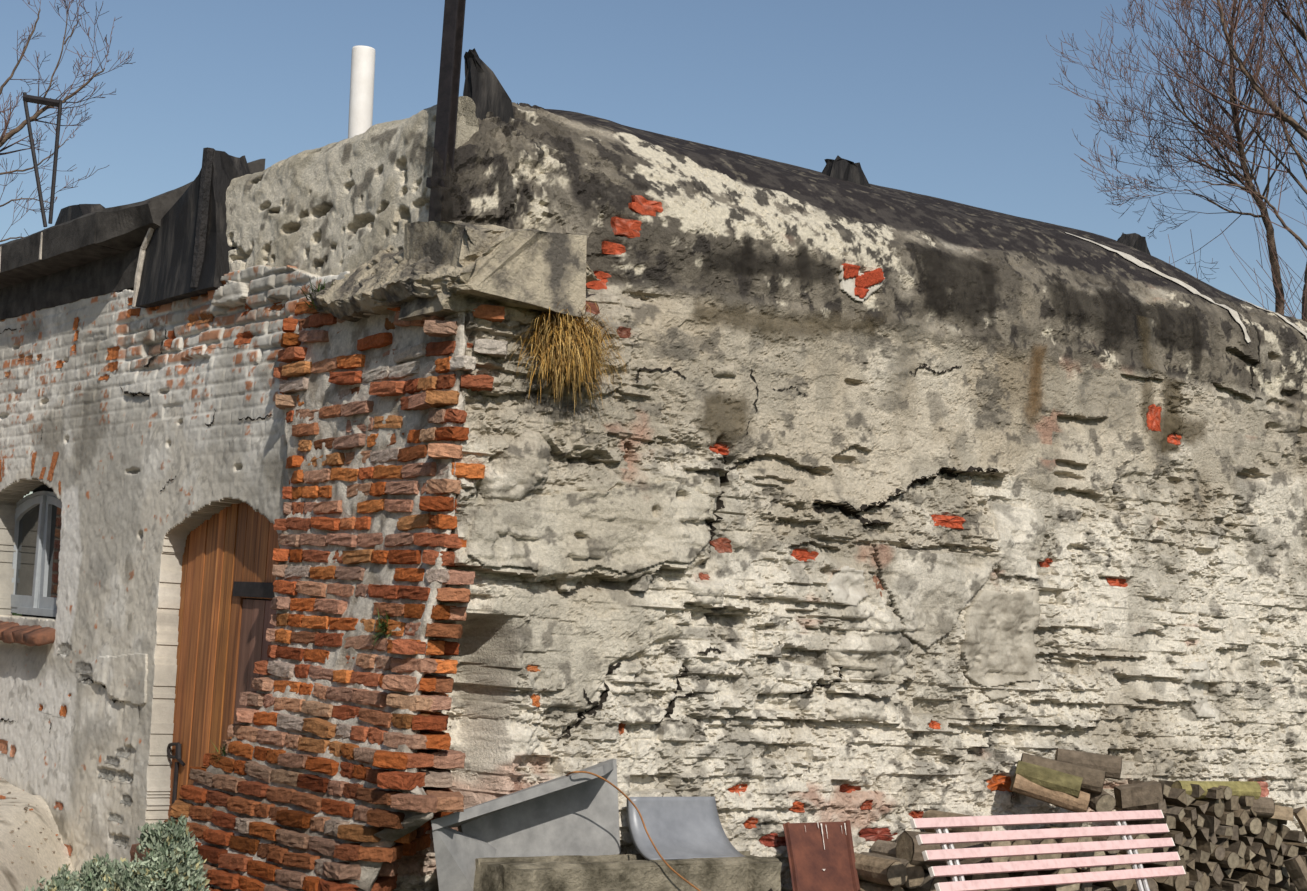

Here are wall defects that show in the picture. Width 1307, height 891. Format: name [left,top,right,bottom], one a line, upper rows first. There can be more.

spalling [163,279,254,352]
spalling [586,193,673,340]
damp [704,234,835,284]
damp [696,305,874,336]
spalling [838,263,885,302]
damp [911,244,996,327]
damp [1050,275,1203,450]
peeling [464,480,742,592]
crack [813,466,999,527]
crack [82,678,140,717]
crack [558,662,621,741]
spalling [96,747,133,848]